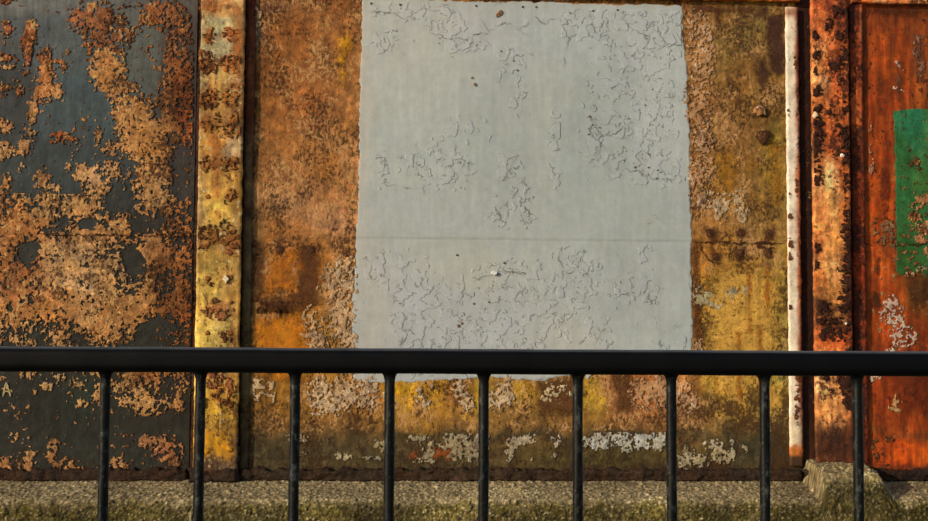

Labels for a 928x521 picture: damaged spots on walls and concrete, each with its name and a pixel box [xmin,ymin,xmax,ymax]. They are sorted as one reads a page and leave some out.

rust [198,7,242,205]
crack [366,3,684,191]
peeling [0,0,194,347]
rust [198,211,240,257]
crack [490,153,536,228]
peeling [871,108,928,351]
rust [200,297,234,343]
crack [362,247,658,350]
rust [691,244,705,348]
peeling [109,372,192,470]
peeling [583,432,666,453]
peeling [677,439,748,470]